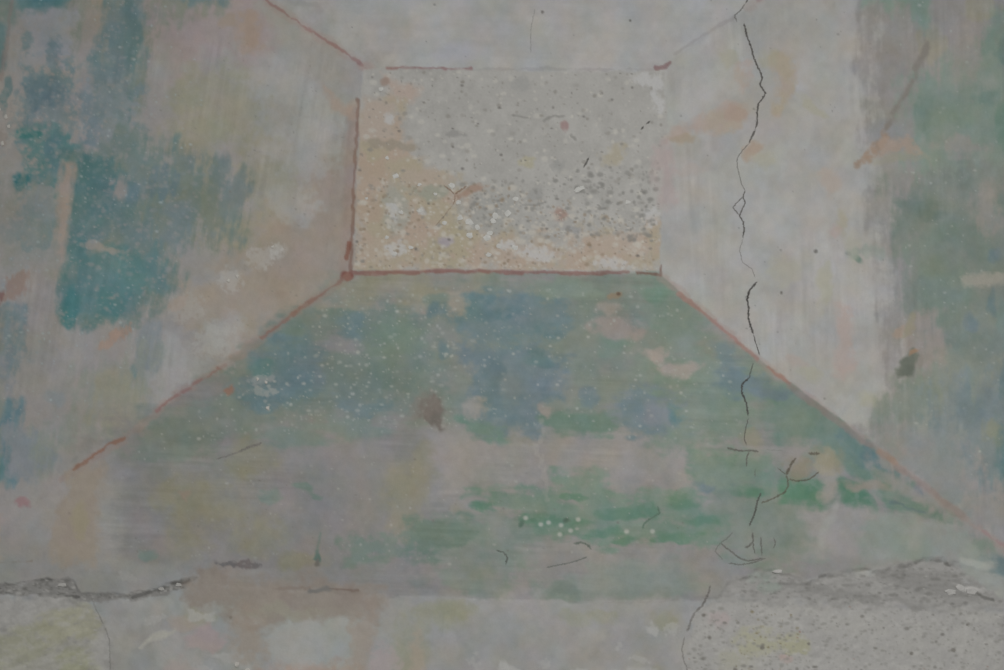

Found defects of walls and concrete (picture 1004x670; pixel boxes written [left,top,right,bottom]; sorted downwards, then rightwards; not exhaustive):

crack [714,0,820,566]
flaking render [0,575,182,670]
crack [681,585,711,670]
flaking render [676,599,1004,670]